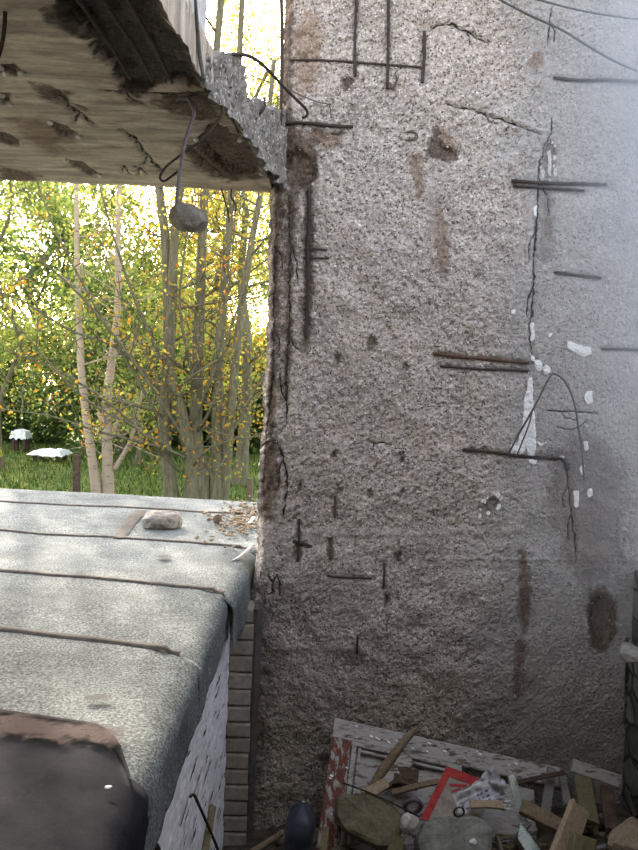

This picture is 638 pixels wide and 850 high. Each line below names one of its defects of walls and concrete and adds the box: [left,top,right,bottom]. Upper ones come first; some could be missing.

crack [429,22,487,45]
spalling [194,123,264,176]
crack [446,103,553,360]
crack [261,198,301,519]
spalling [462,448,569,471]
crack [562,473,576,561]
rust [519,549,531,628]